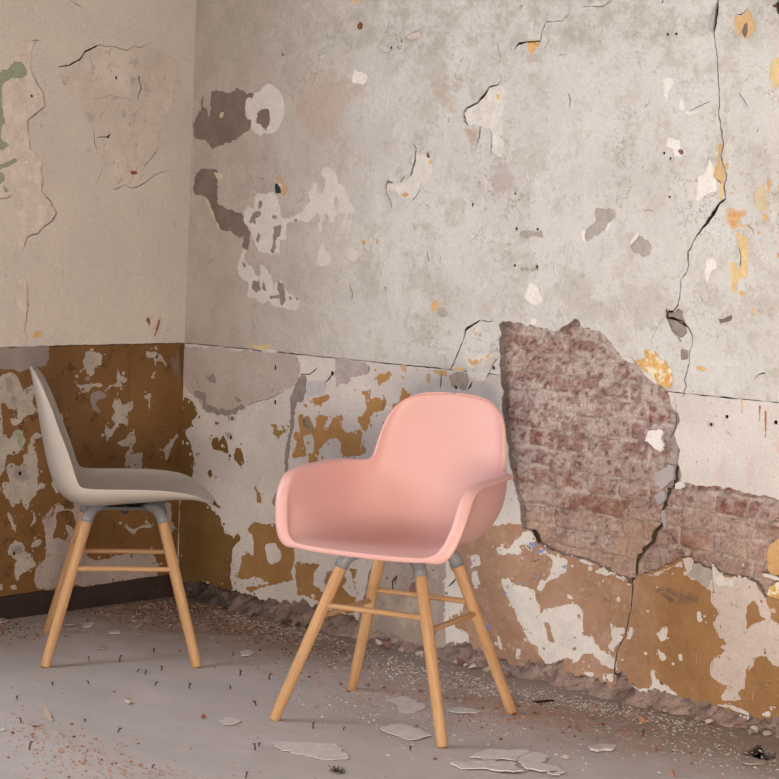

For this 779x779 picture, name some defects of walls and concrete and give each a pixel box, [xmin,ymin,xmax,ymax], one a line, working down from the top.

crack [500,17,566,55]
crack [712,0,720,50]
spalling [194,169,250,250]
spalling [193,88,254,149]
crack [684,75,727,276]
peeling [0,345,81,590]
peeling [73,348,146,469]
peeling [165,498,332,630]
spalling [159,344,419,478]
spalling [368,561,425,656]
spalling [425,319,779,738]
crack [614,298,693,675]